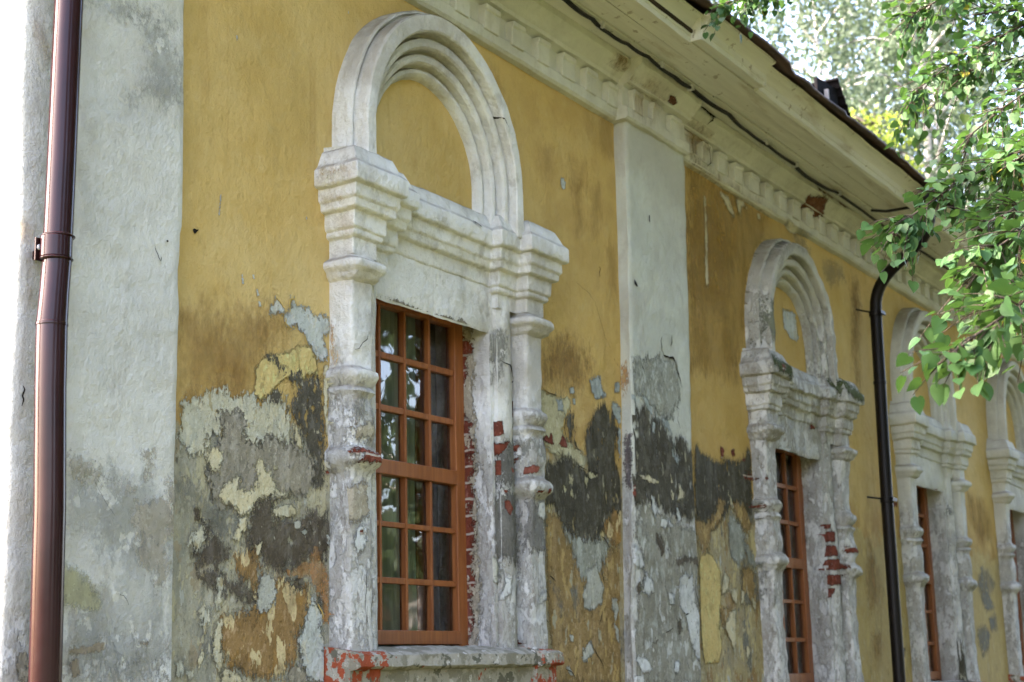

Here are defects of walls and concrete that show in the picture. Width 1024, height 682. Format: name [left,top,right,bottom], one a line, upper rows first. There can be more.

flaking render [801,188,849,217]
leakage [64,566,101,610]
flaking render [173,274,334,682]
flaking render [345,418,382,466]
flaking render [493,401,540,515]
peeling [537,387,654,682]
leakage [495,399,768,682]
flaking render [590,352,681,458]
peeling [633,450,685,528]
crack [641,338,682,426]
peeling [669,490,767,664]
flaking render [805,524,859,598]